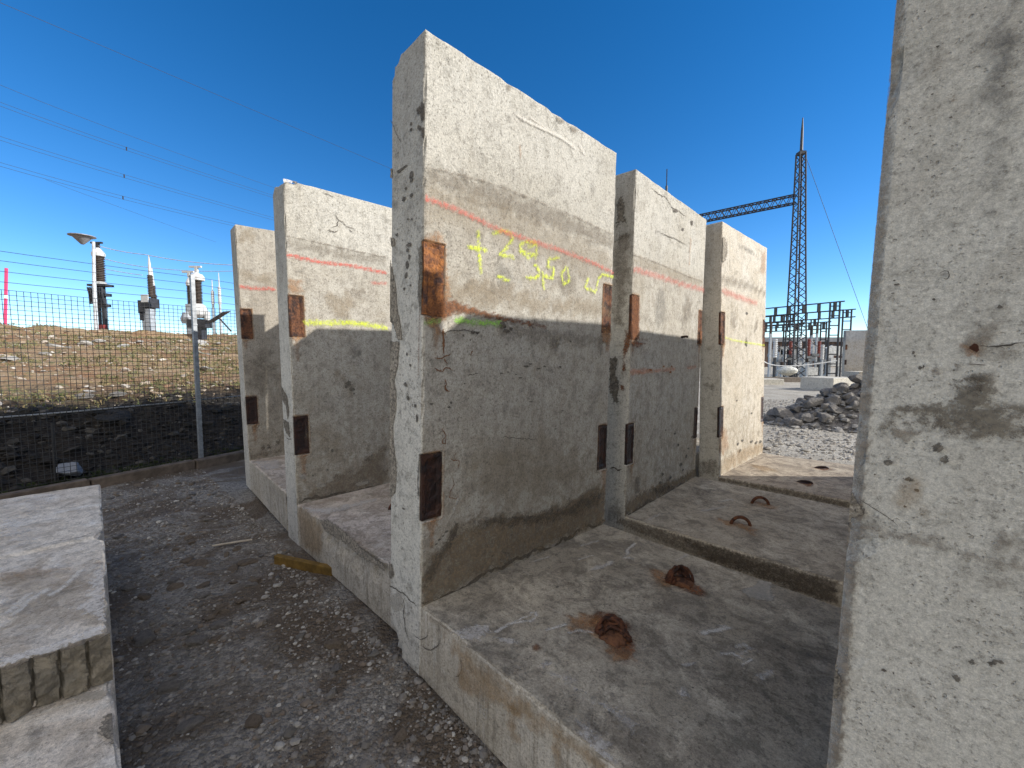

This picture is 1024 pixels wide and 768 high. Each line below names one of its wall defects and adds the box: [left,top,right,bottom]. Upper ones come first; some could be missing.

rust [419,277,545,329]
crack [390,477,694,636]
water stain [422,462,849,606]